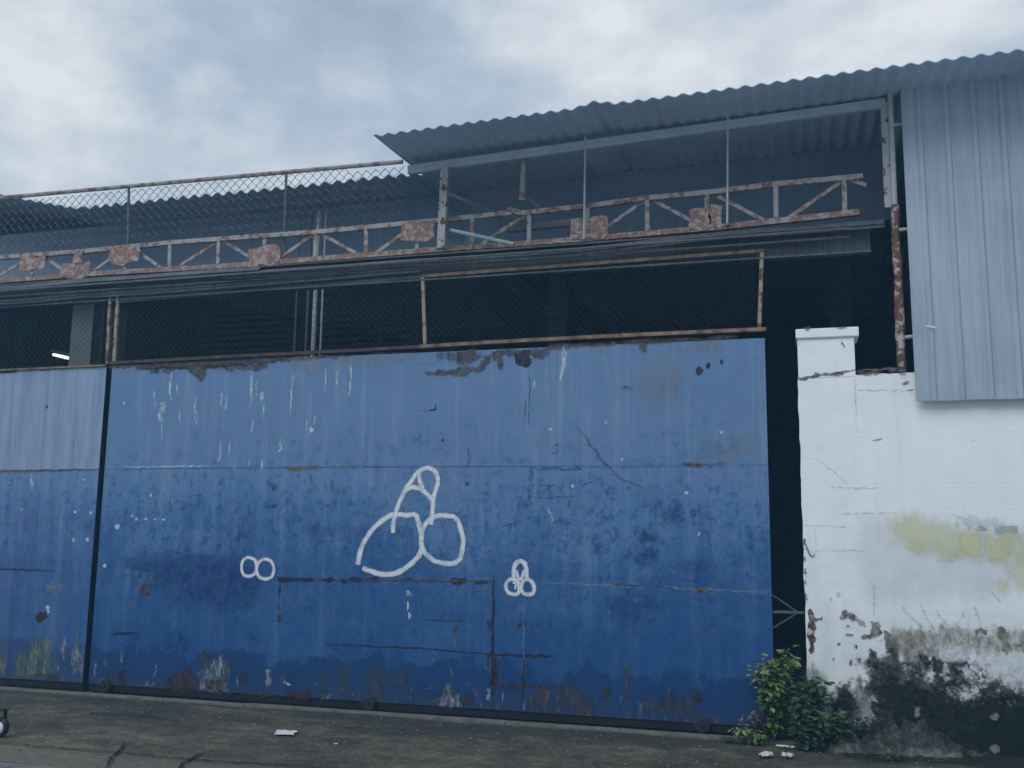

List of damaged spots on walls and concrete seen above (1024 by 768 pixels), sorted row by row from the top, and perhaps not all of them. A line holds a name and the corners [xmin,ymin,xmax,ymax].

crack [798,370,855,381]
rust [461,575,545,710]
peeling [837,610,899,666]
leakage [806,625,1024,757]